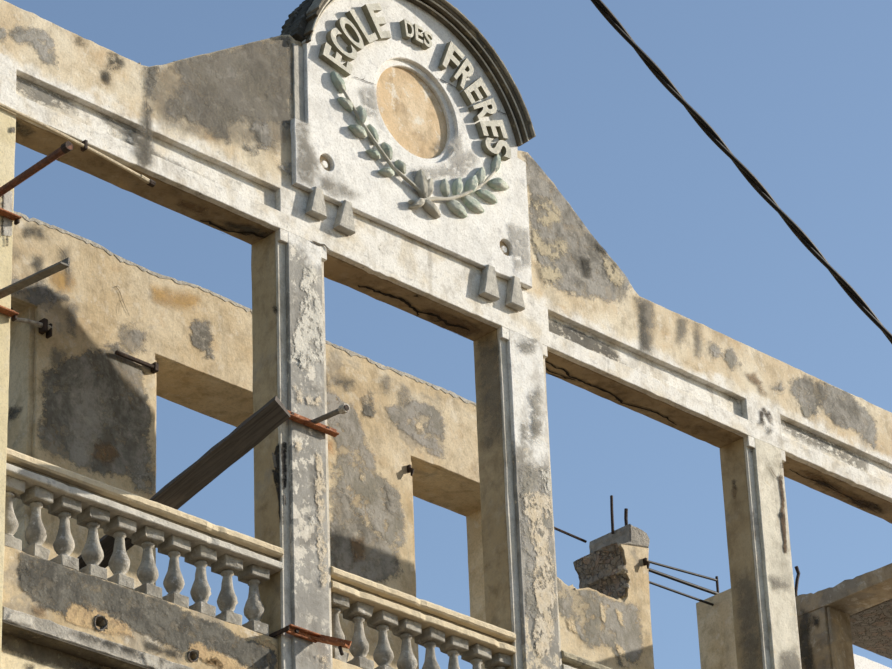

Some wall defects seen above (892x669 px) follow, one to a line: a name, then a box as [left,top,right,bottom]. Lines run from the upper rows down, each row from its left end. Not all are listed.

peeling [291,264,324,370]
crack [358,285,470,331]
damp [549,321,619,361]
damp [636,298,654,351]
damp [678,319,701,356]
crack [545,361,676,425]
spalling [272,442,302,525]
peeling [520,462,643,669]
damp [2,552,277,669]